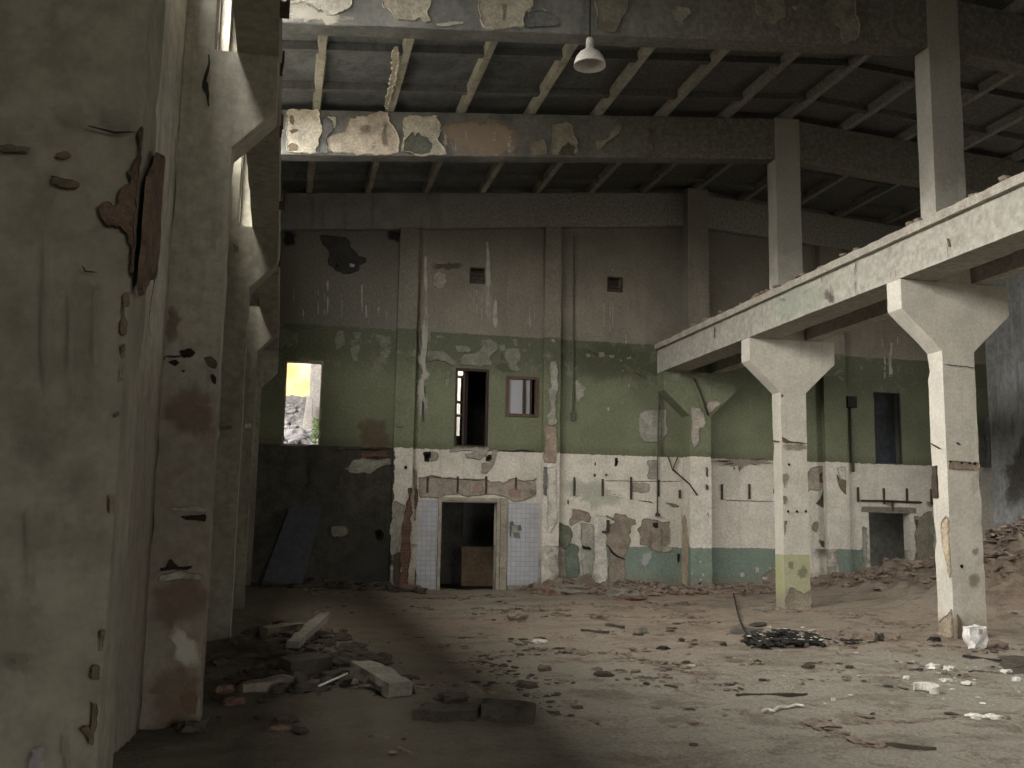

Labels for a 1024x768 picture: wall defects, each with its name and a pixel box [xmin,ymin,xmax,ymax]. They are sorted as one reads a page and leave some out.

peeling [478,0,533,31]
peeling [286,46,447,157]
spalling [320,235,367,274]
spalling [168,348,217,394]
peeling [423,335,522,387]
peeling [374,361,704,586]
peeling [773,466,829,547]
spalling [914,511,951,578]